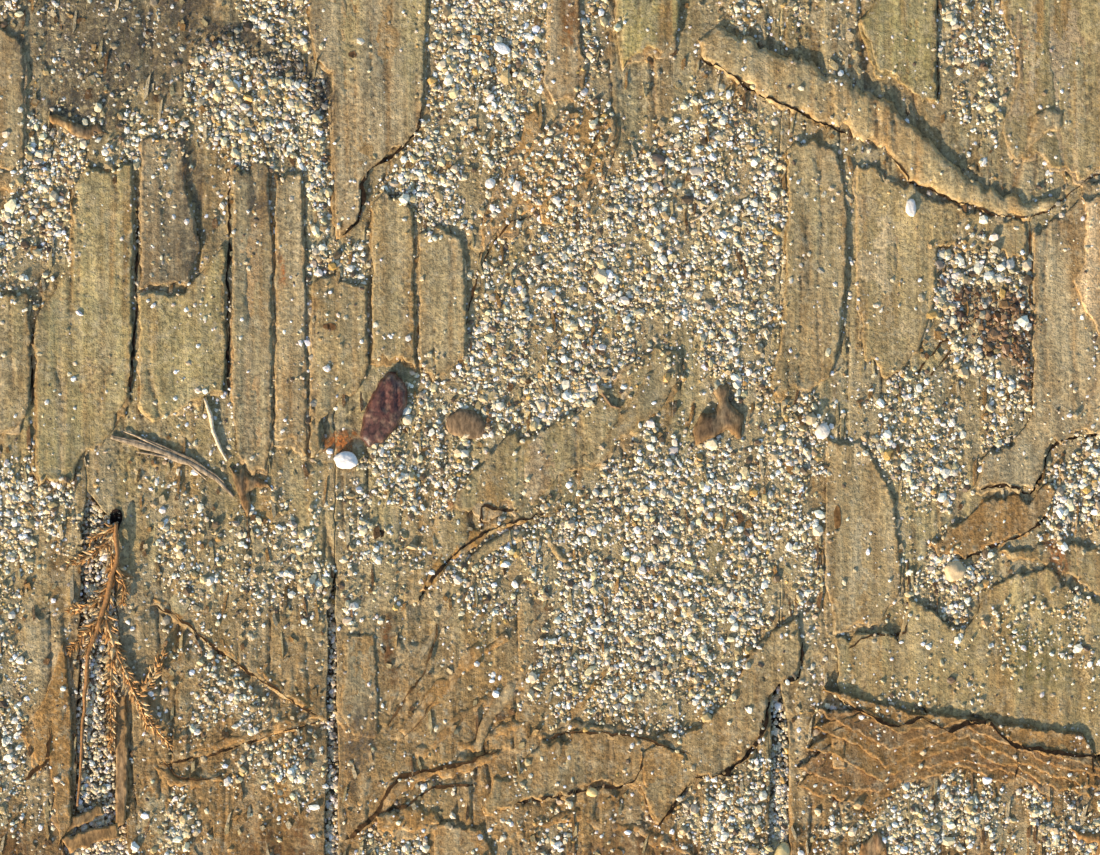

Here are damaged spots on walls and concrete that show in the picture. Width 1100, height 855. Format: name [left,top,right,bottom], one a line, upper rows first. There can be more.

damp [36,0,196,125]
damp [206,20,334,112]
crack [700,60,849,138]
crack [934,2,942,99]
crack [344,107,422,235]
crack [888,152,1100,397]
crack [959,433,1099,559]
crack [518,642,804,826]